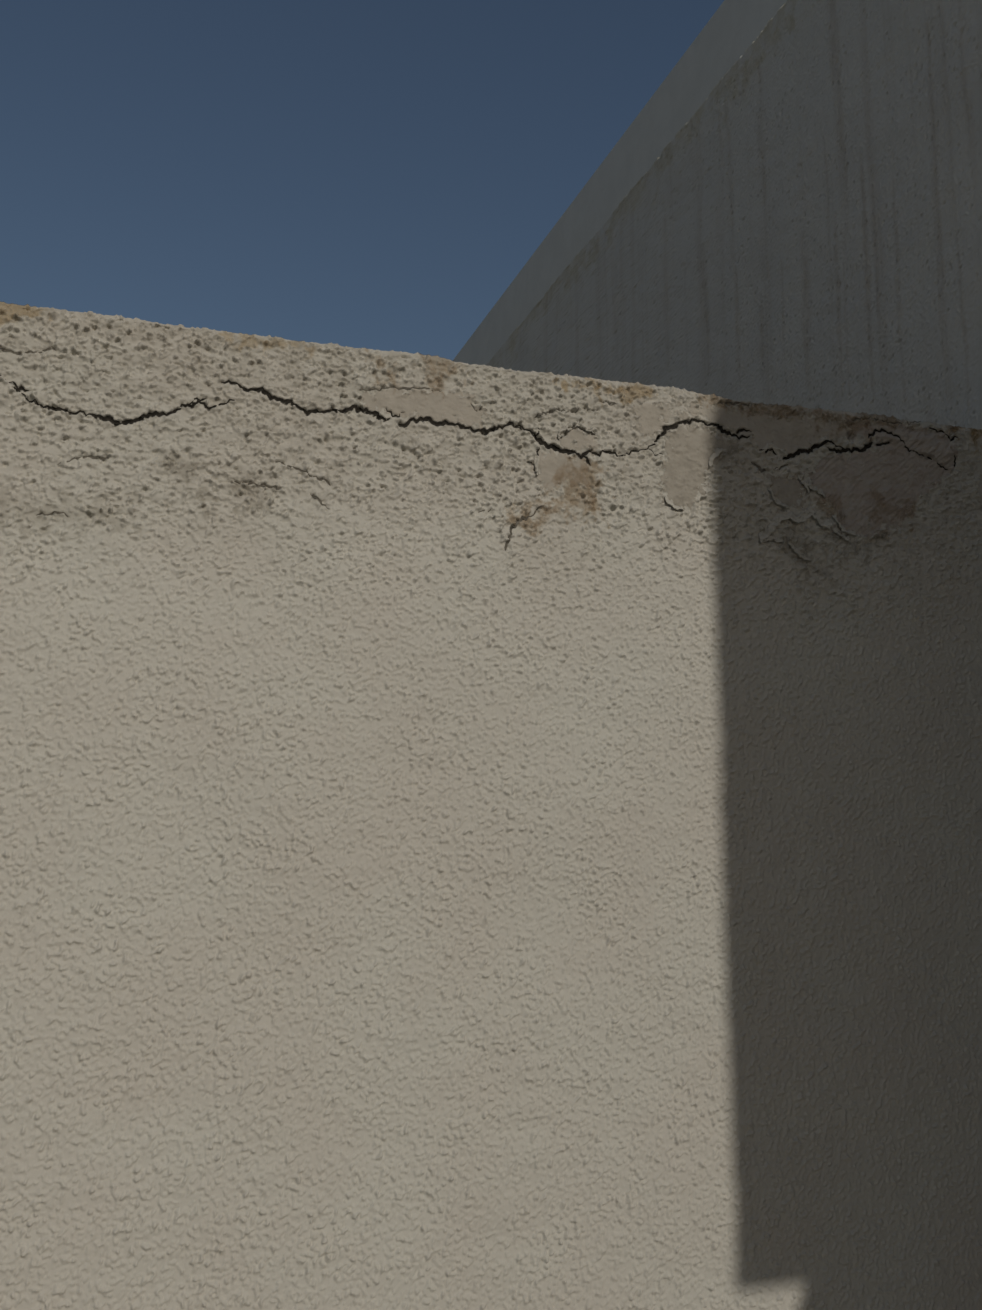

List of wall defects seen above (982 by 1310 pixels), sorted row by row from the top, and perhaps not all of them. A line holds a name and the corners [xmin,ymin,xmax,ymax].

crack [0,346,958,472]
peeling [530,421,600,494]